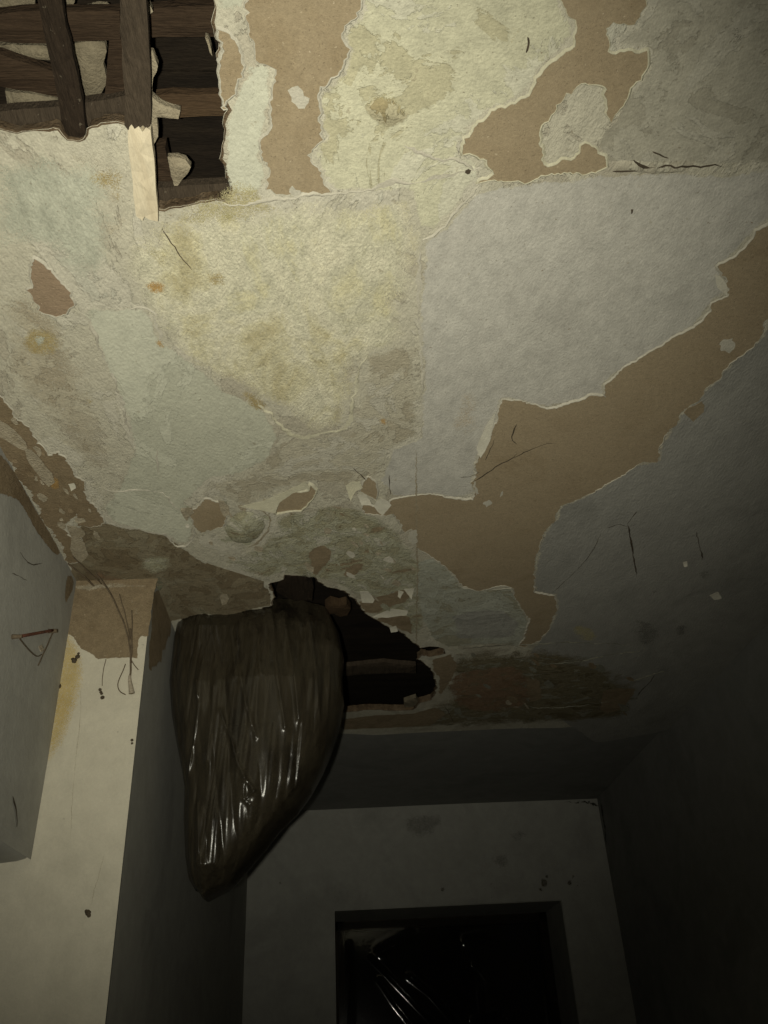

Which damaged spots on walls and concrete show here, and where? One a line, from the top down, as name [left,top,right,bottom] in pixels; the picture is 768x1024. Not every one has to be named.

peeling [215,0,363,198]
peeling [459,0,651,185]
crack [613,151,722,172]
peeling [25,255,76,318]
crack [461,424,552,482]
peeling [305,222,768,647]
peeling [341,707,445,730]